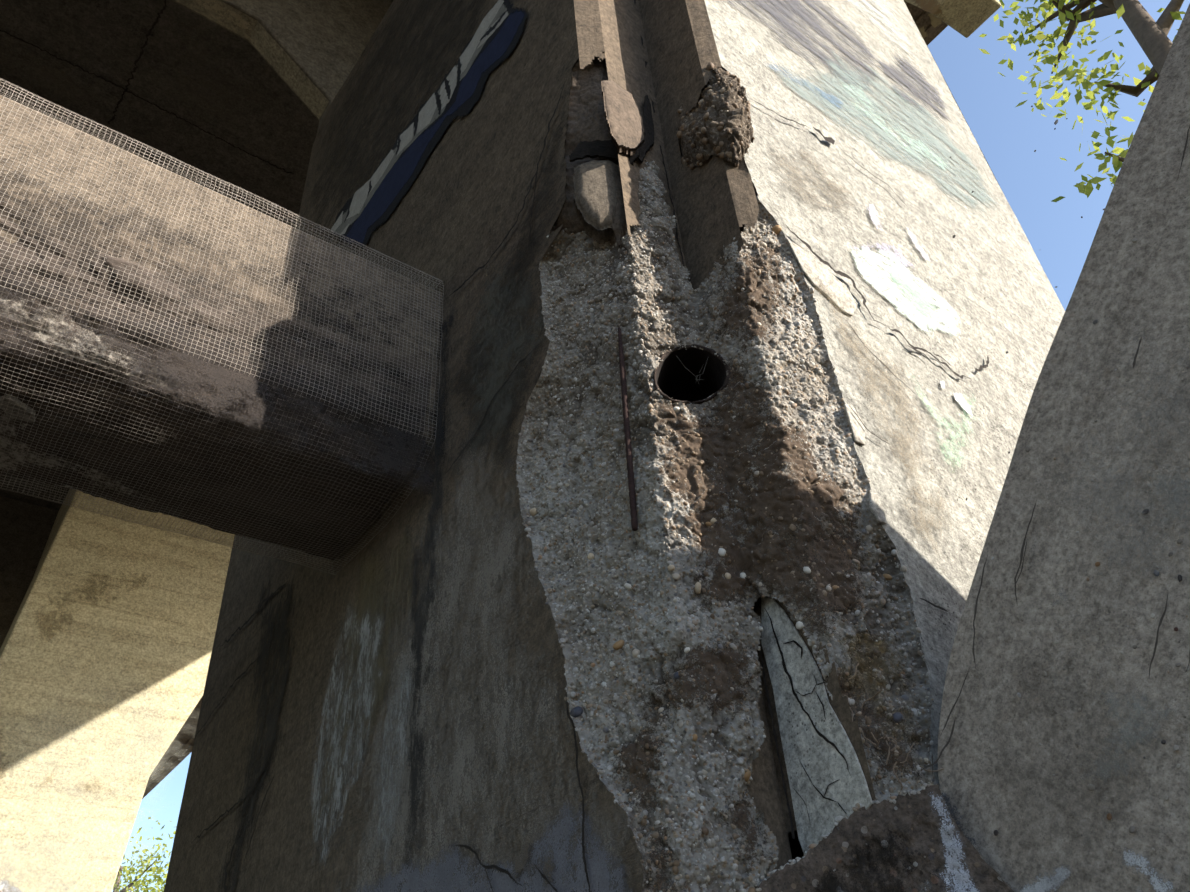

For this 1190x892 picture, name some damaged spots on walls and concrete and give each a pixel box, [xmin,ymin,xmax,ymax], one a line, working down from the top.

crack [787,227,989,394]
spalling [516,52,938,892]
water stain [651,234,922,791]
crack [451,845,558,892]
crack [565,688,590,892]
water stain [720,790,770,872]
crack [764,608,849,821]
water stain [817,830,912,892]
water stain [921,793,979,892]
crack [1149,594,1168,676]